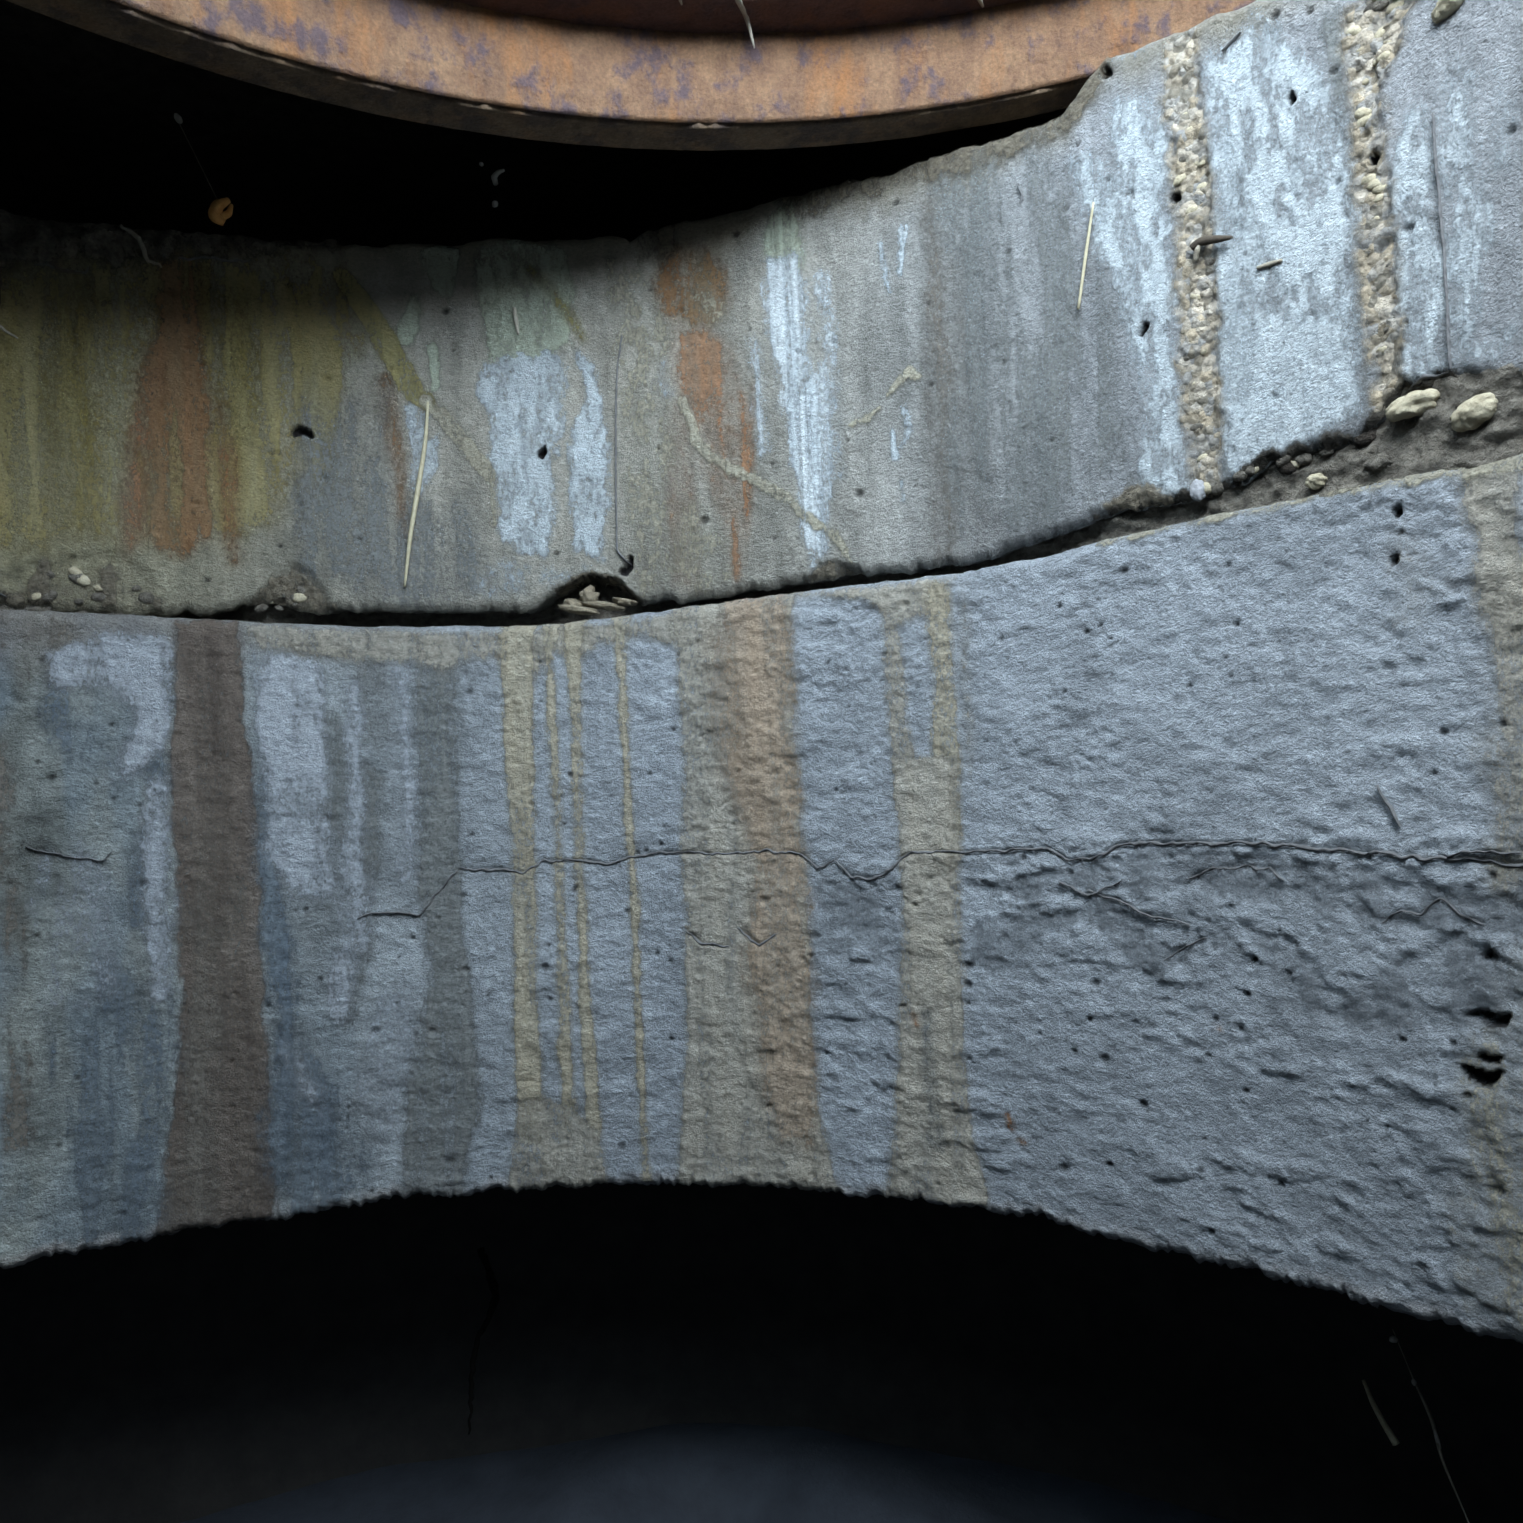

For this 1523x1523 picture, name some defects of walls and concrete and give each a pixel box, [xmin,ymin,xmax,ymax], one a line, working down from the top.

rust [651,246,756,580]
leakage [288,55,1190,611]
leakage [1201,6,1372,486]
leakage [1387,66,1517,389]
leakage [30,631,179,1248]
leakage [247,613,680,1217]
rust [671,592,841,1193]
leakage [798,576,988,1207]
crack [357,840,1523,961]
leakage [1187,453,1523,897]
leakage [1460,1042,1523,1325]